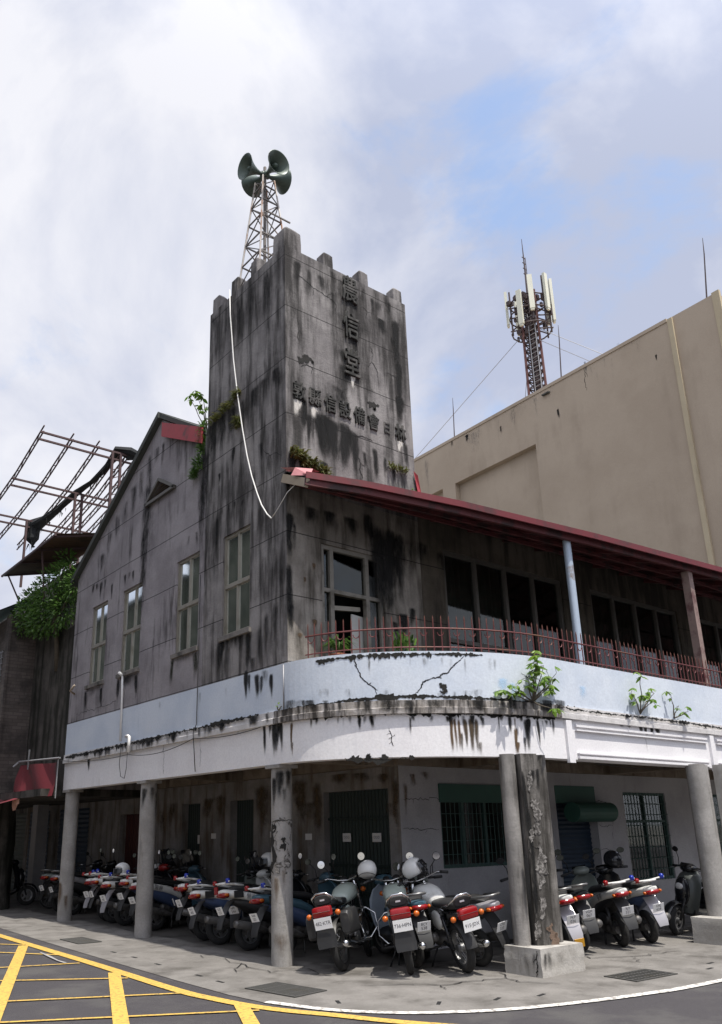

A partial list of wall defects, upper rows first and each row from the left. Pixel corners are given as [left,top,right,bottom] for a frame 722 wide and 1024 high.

damp [295,262,359,400]
damp [371,299,404,416]
damp [92,444,164,594]
damp [65,712,283,768]
damp [200,369,279,544]
damp [217,566,293,695]
damp [286,513,296,551]
damp [285,399,395,488]
damp [307,507,415,634]
crack [415,656,464,694]
damp [286,679,722,749]
peeling [527,771,560,945]